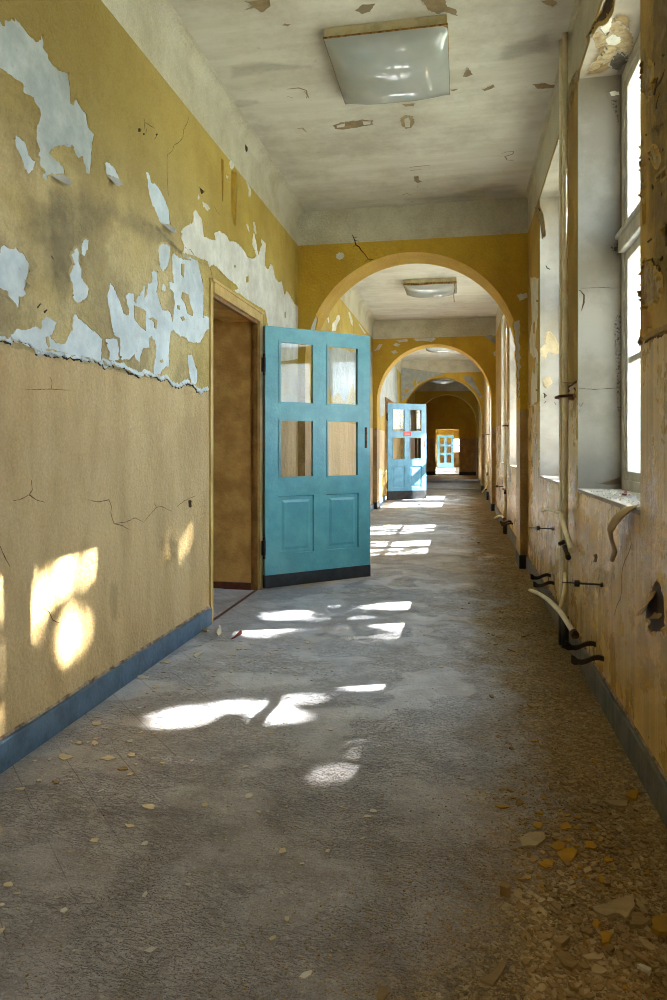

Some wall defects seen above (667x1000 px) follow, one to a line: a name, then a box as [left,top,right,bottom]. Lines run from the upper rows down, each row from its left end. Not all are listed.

peeling [242,0,273,13]
peeling [419,0,460,17]
peeling [568,0,654,113]
peeling [0,14,124,186]
peeling [332,119,375,130]
peeling [638,131,661,204]
peeling [0,170,298,395]
peeling [637,242,667,346]
peeling [328,347,356,404]
peeling [370,337,447,419]
peeling [512,276,575,408]
crack [92,496,194,529]